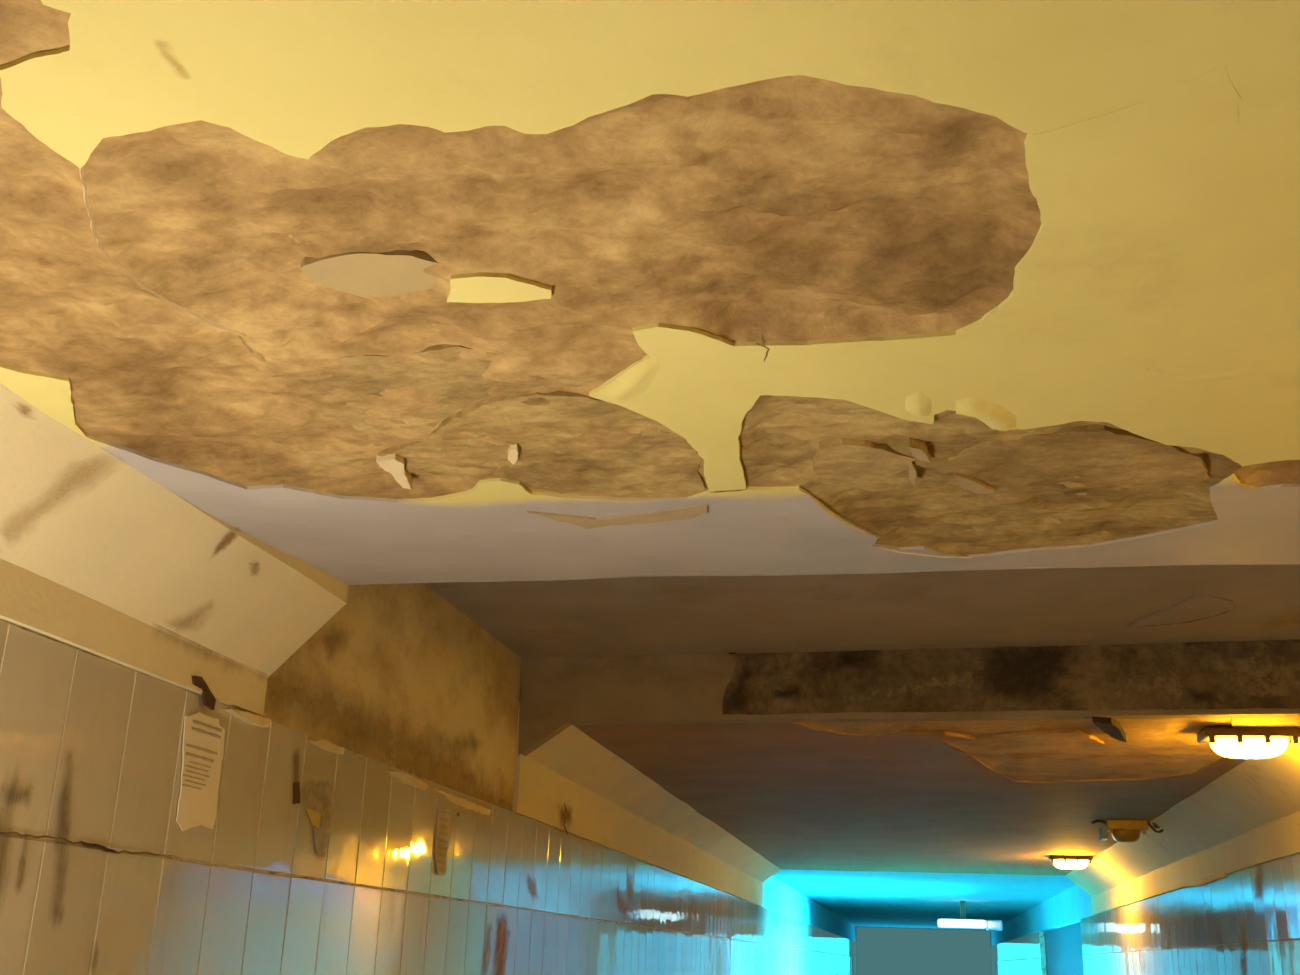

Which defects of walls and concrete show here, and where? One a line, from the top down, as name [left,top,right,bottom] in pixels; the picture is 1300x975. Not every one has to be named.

spalling [0,0,1041,529]
spalling [739,395,1300,558]
spalling [722,639,1300,782]
crack [1,831,176,857]
corrosion [484,917,509,975]